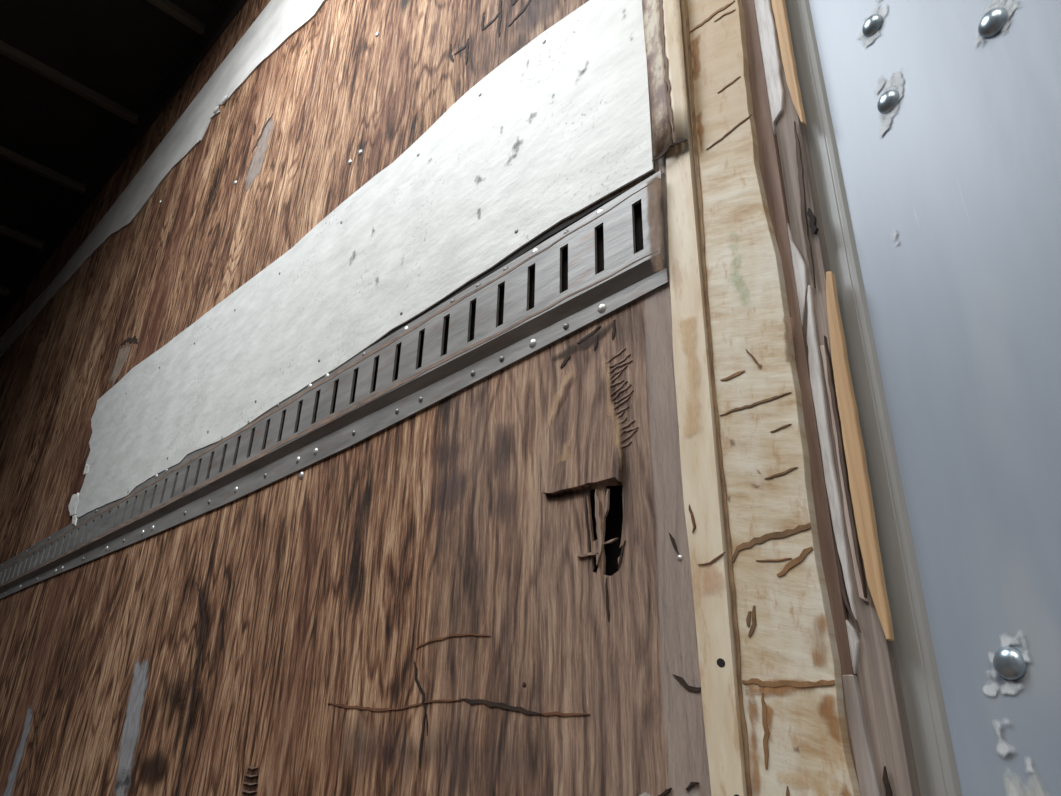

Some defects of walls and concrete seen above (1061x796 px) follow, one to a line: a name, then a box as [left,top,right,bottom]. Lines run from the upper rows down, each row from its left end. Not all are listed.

peeling [857,0,888,47]
peeling [874,71,903,137]
peeling [983,632,1030,696]
crack [328,633,588,769]
peeling [994,719,1013,756]